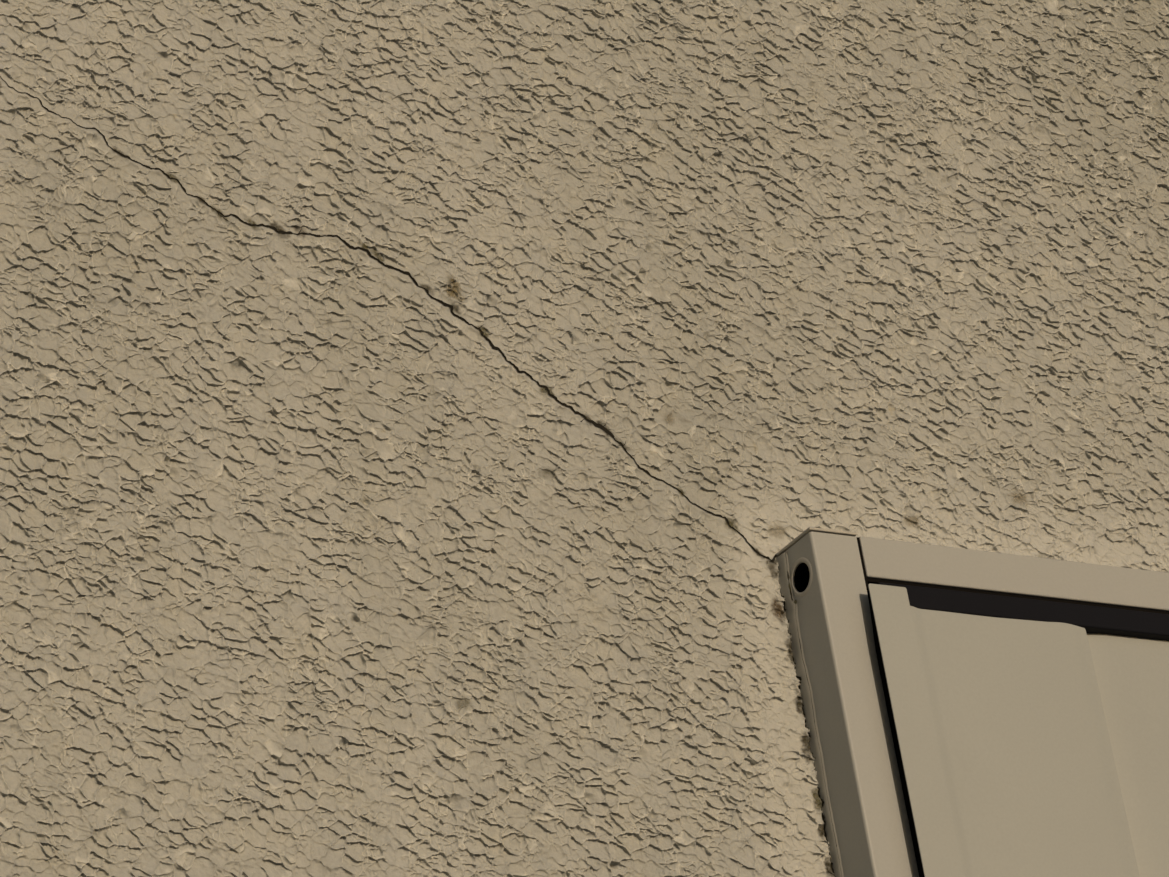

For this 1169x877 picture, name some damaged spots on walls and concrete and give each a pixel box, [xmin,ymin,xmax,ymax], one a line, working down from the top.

crack [0,76,842,877]